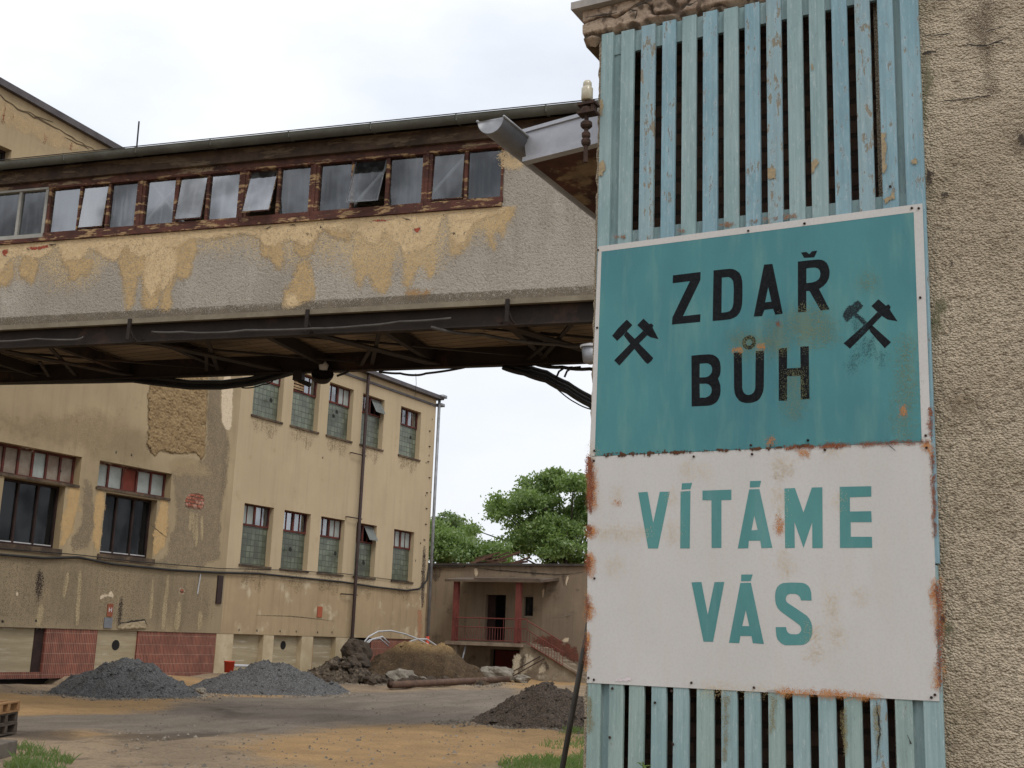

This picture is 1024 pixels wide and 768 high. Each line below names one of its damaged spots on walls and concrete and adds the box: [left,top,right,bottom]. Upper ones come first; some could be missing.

crack [0,94,94,150]
peeling [0,206,517,315]
spalling [146,377,209,459]
spalling [184,493,205,547]